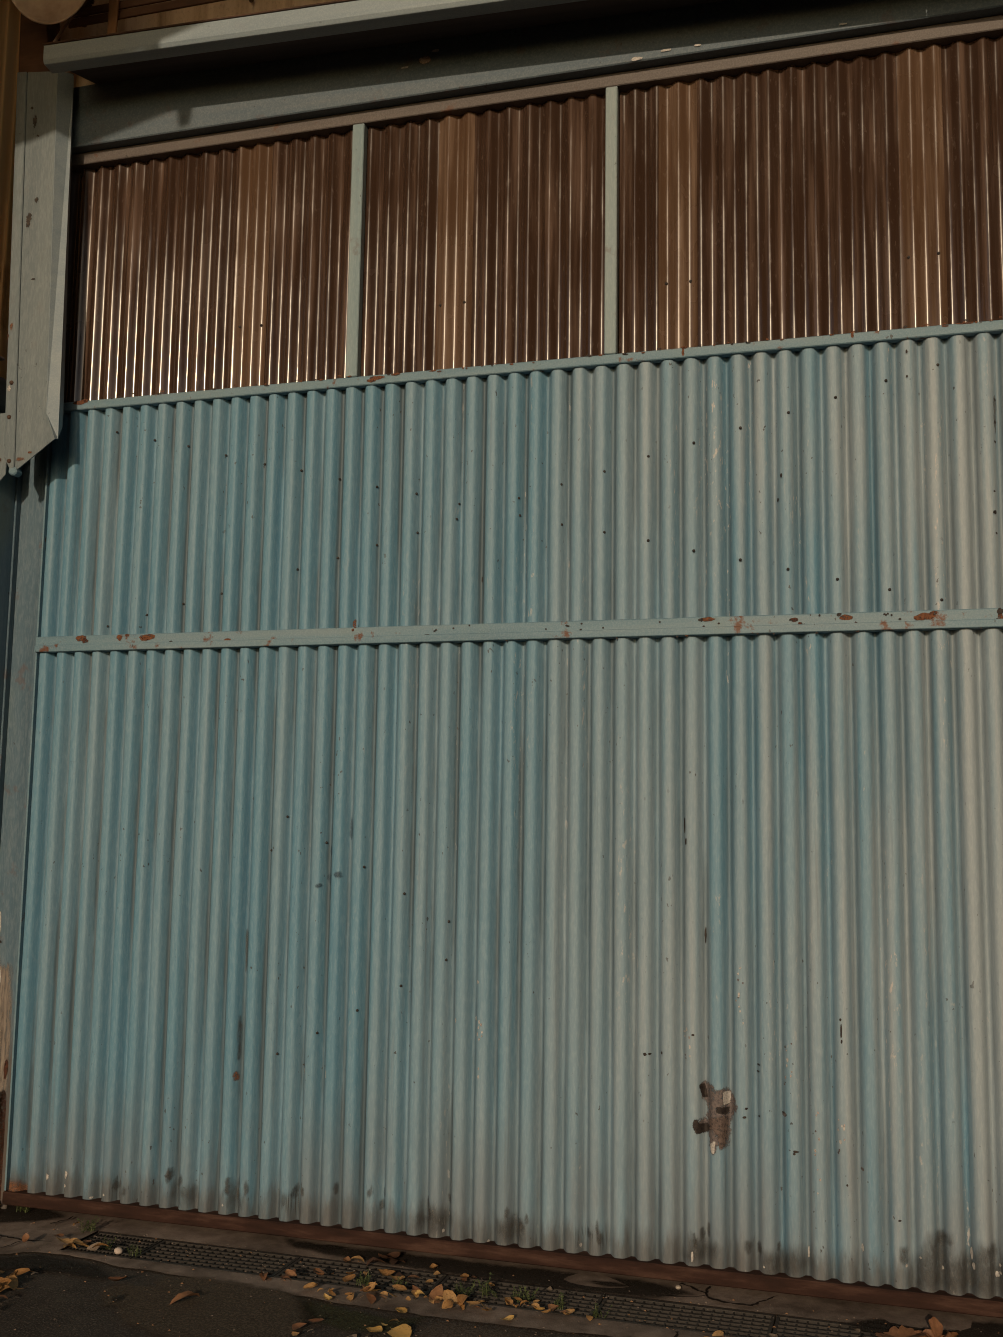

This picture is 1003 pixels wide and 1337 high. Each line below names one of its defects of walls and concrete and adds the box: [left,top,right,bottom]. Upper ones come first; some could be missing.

corrosion [117,634,172,642]
corrosion [914,611,937,620]
corrosion [0,1060,28,1199]
peeling [693,1081,760,1154]